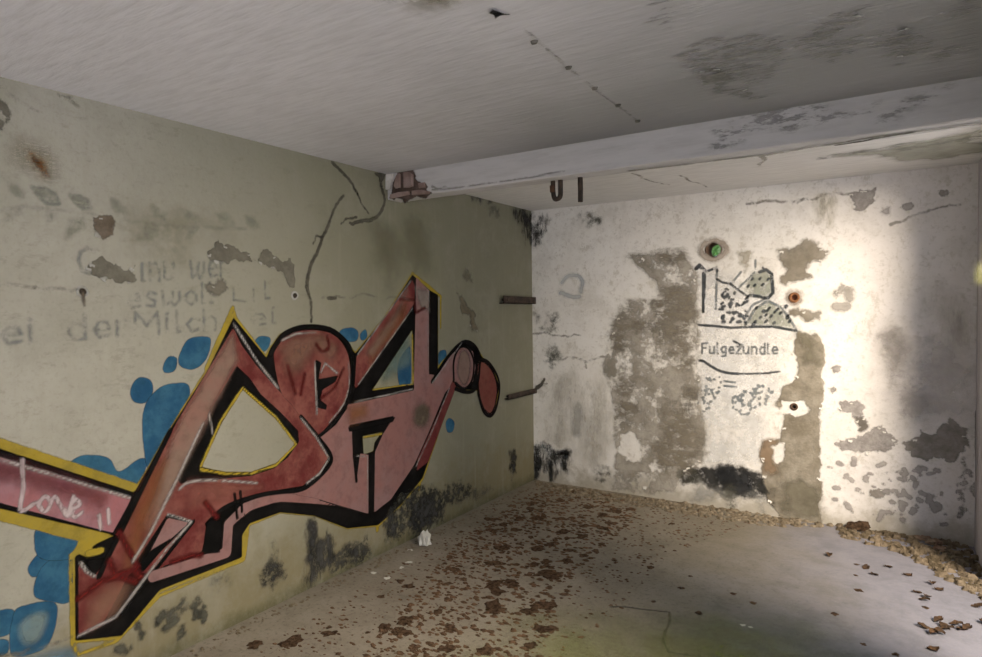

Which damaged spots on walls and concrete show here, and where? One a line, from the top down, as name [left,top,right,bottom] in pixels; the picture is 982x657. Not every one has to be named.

peeling [0,100,11,130]
corrosion [25,151,50,177]
spalling [385,170,432,203]
peeling [93,215,115,239]
peeling [206,240,299,300]
crack [305,161,386,323]
peeling [779,239,830,285]
peeling [832,284,854,311]
peeling [603,251,706,494]
peeling [759,308,975,526]
damp [678,465,774,507]